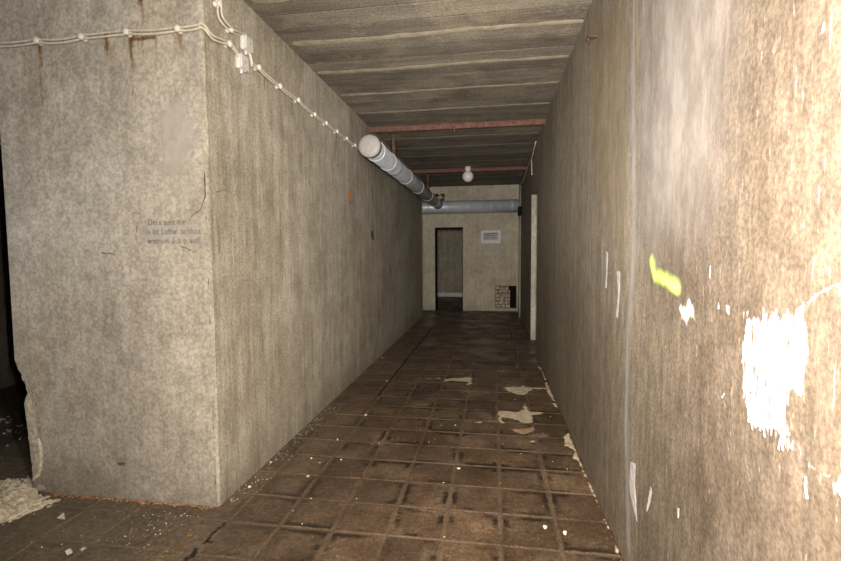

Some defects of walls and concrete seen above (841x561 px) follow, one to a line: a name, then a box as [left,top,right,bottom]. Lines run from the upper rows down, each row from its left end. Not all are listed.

spalling [15,361,47,490]